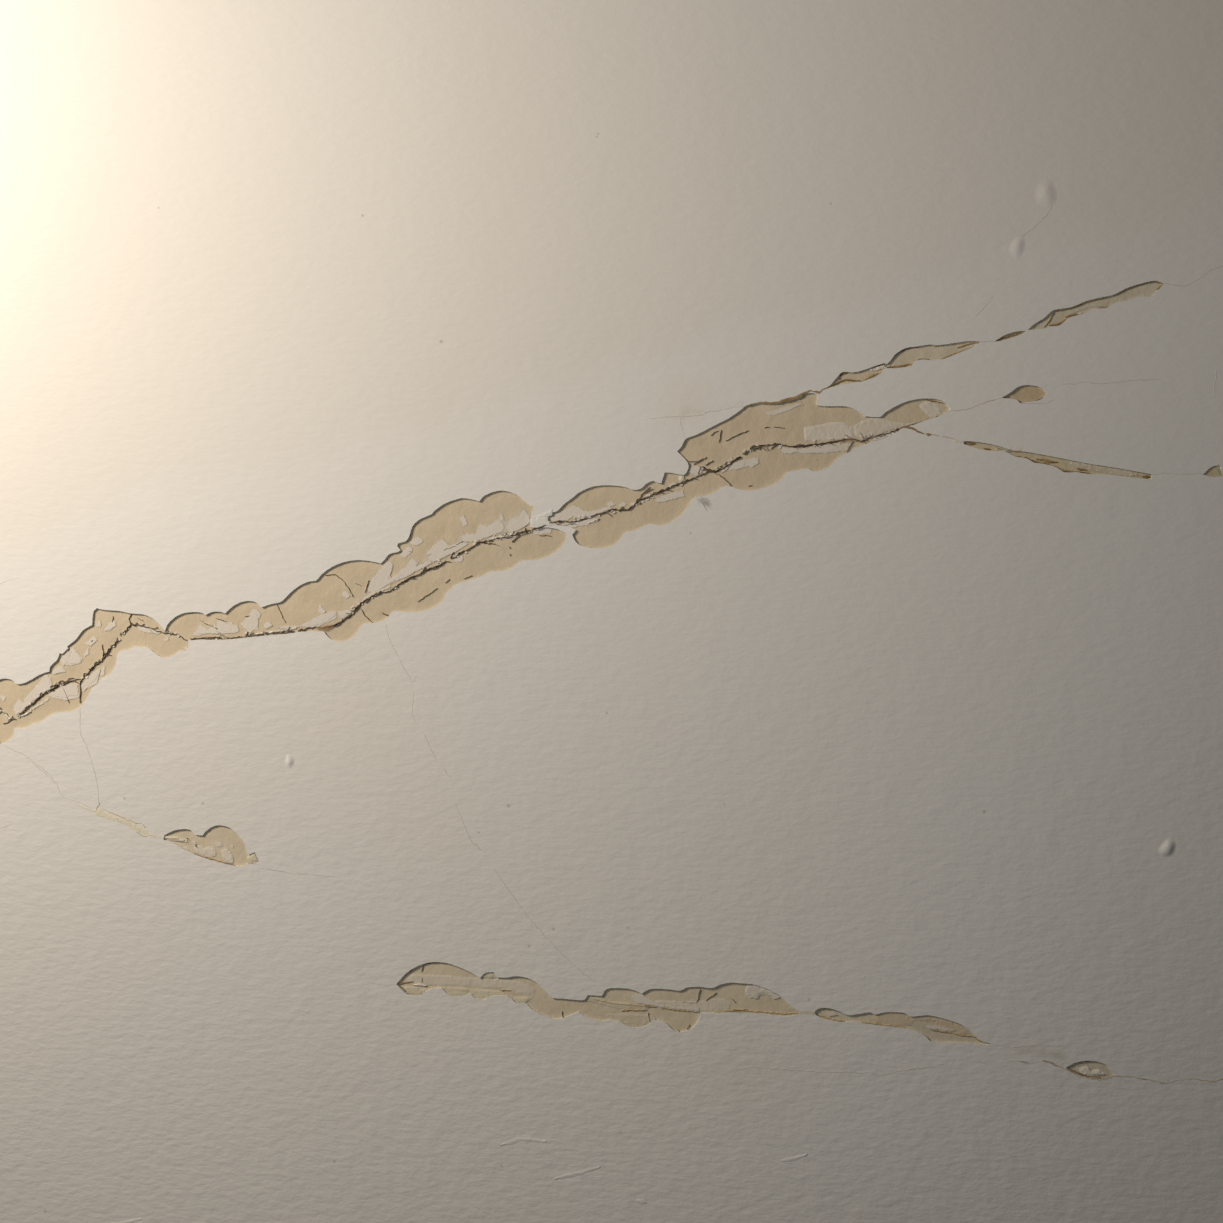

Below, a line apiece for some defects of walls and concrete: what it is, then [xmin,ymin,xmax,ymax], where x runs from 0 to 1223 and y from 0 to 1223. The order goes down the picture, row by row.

peeling [996,281,1163,341]
peeling [829,342,980,387]
peeling [1002,385,1047,403]
peeling [950,439,1152,479]
peeling [1203,465,1223,477]
peeling [0,393,950,744]
crack [0,379,1152,982]
peeling [74,802,259,866]
peeling [397,962,990,1045]
crack [733,1043,1223,1084]
peeling [1066,1061,1114,1079]